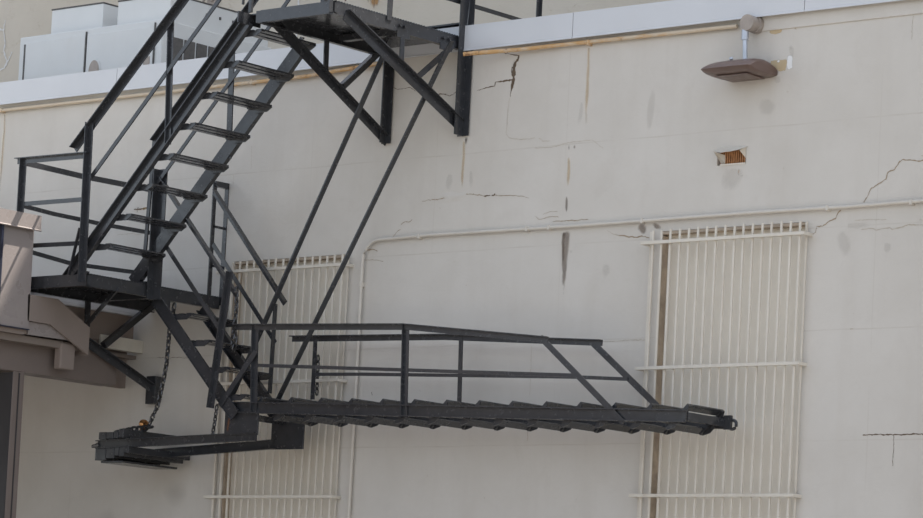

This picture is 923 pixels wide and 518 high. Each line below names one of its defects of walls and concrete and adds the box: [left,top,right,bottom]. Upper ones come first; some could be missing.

crack [439,53,603,148]
crack [813,155,923,234]